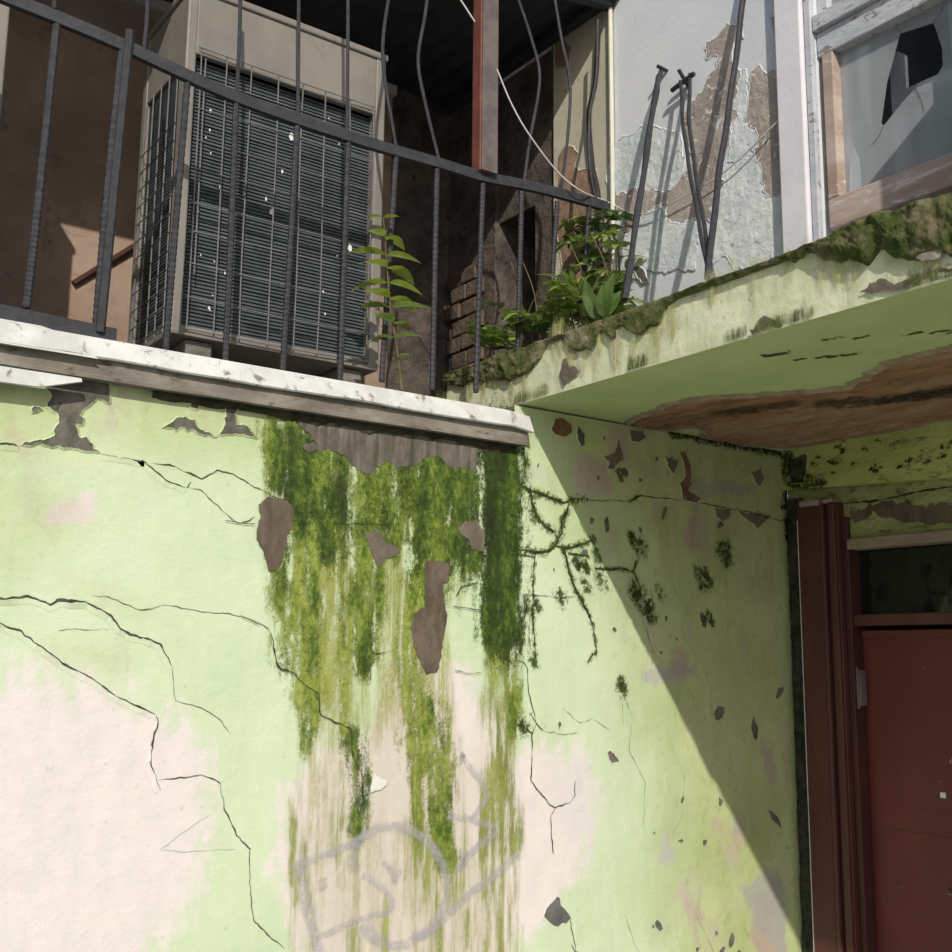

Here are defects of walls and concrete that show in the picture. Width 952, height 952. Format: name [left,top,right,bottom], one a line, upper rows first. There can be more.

peeling [553,20,783,284]
crack [0,442,20,452]
spalling [21,380,112,454]
crack [100,454,277,524]
spalling [256,497,294,571]
spalling [411,561,449,674]
damp [571,547,609,593]
damp [628,579,666,625]
damp [693,564,714,593]
crack [513,486,677,854]
damp [615,675,628,698]
crack [0,595,363,948]